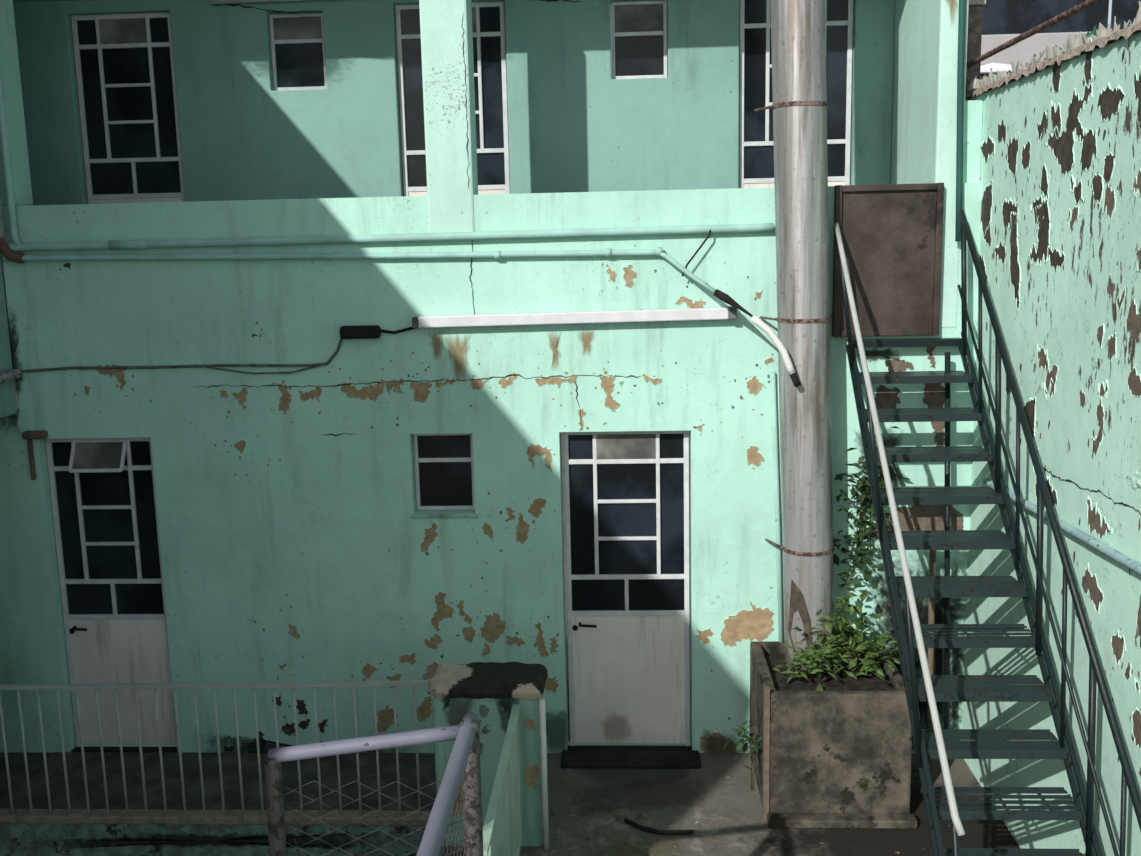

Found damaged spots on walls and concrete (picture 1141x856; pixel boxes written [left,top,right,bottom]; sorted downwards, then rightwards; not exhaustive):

crack [461,18,469,187]
peeling [979,38,1141,311]
crack [198,374,641,427]
peeling [593,361,662,425]
peeling [1005,334,1060,510]
peeling [1079,261,1141,458]
crack [1042,467,1141,515]
peeling [1079,496,1113,539]
peeling [351,591,560,691]
peeling [696,601,775,648]
peeling [1061,551,1104,622]
peeling [1105,594,1141,694]